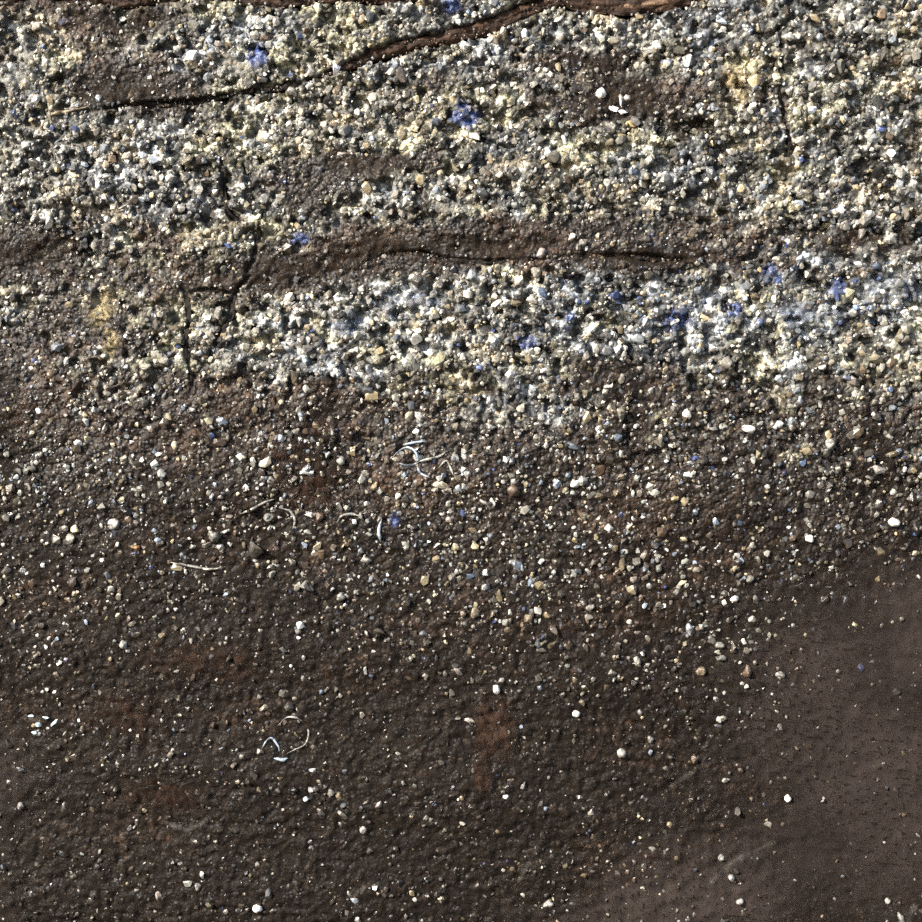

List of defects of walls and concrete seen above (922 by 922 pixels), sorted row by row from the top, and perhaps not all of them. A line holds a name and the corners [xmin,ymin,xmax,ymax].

crack [69,0,186,8]
crack [90,0,700,112]
crack [779,41,791,157]
crack [394,252,507,265]